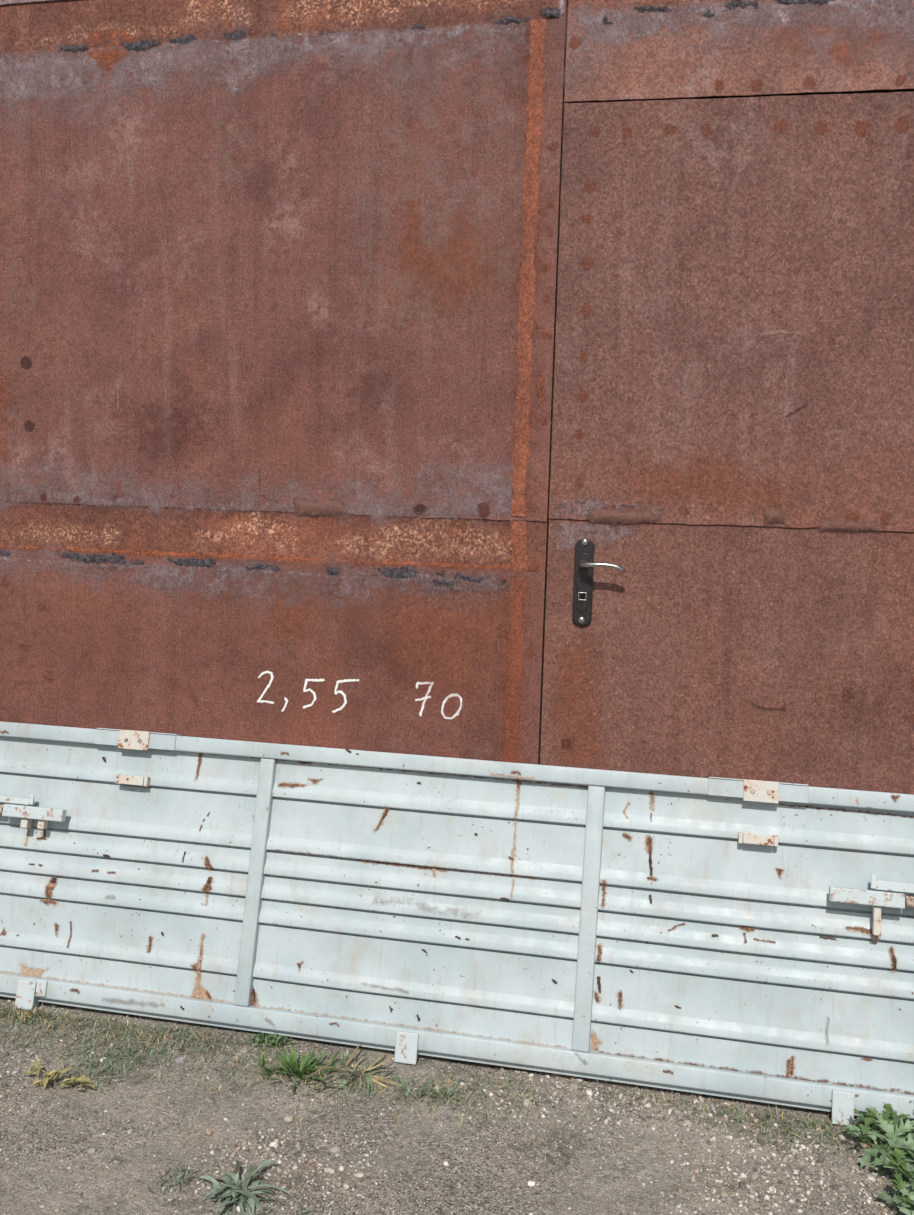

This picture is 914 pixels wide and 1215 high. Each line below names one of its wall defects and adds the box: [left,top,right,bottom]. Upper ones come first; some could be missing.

corrosion [286,0,454,29]
corrosion [21,356,32,369]
corrosion [0,502,512,570]